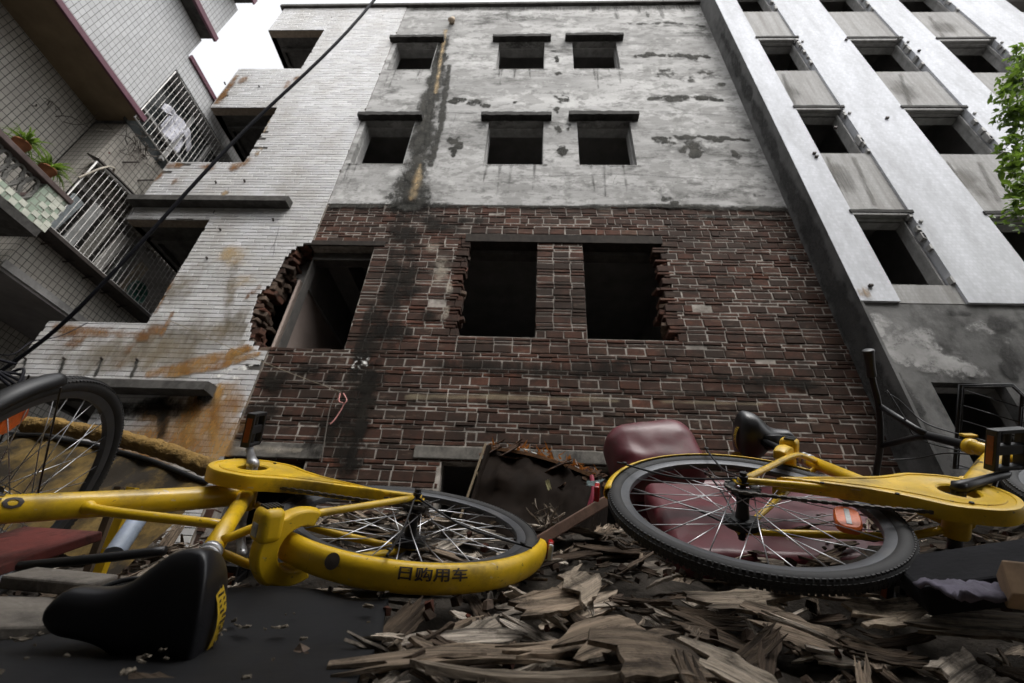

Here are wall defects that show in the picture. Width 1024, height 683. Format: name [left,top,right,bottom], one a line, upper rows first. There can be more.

damp [122,35,956,476]
spalling [249,245,314,352]
rust [54,324,120,348]
rust [129,311,174,351]
damp [78,314,249,377]
rust [147,345,261,377]